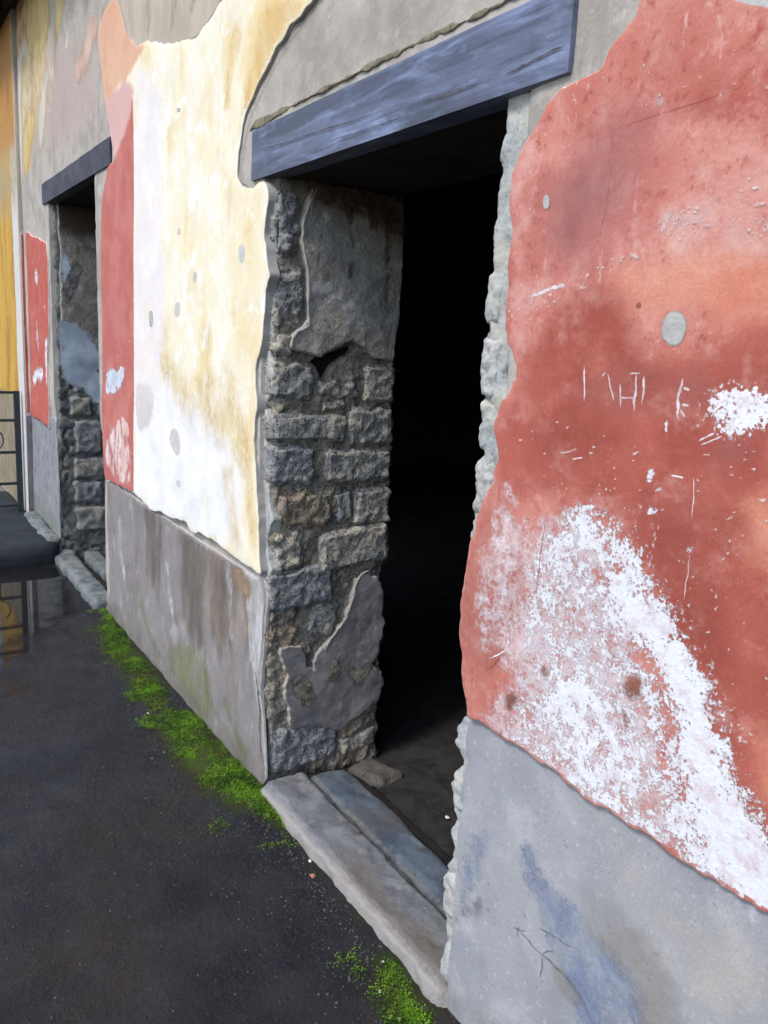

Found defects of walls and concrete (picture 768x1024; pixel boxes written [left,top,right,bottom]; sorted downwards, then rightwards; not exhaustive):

spalling [61,261,81,302]
spalling [291,675,314,706]
crack [515,916,592,1022]